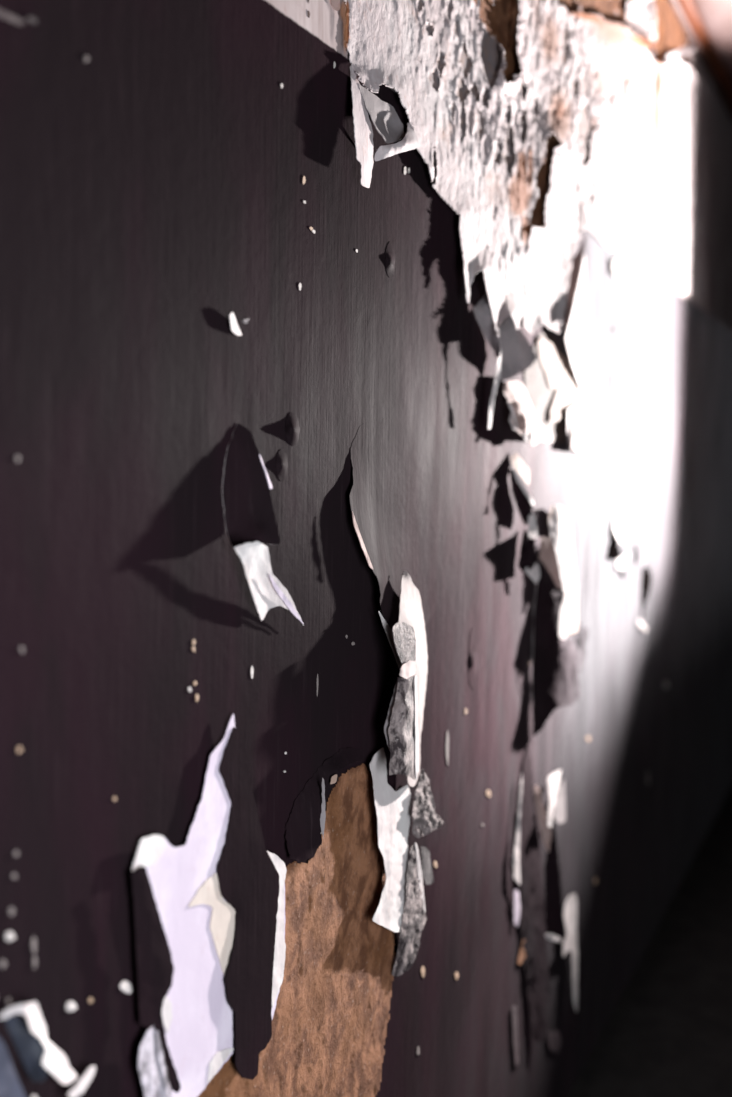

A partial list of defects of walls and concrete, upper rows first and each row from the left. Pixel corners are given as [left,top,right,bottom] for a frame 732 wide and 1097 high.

peeling [331,0,707,452]
peeling [222,423,304,626]
peeling [509,469,589,673]
flaking render [131,714,444,1097]